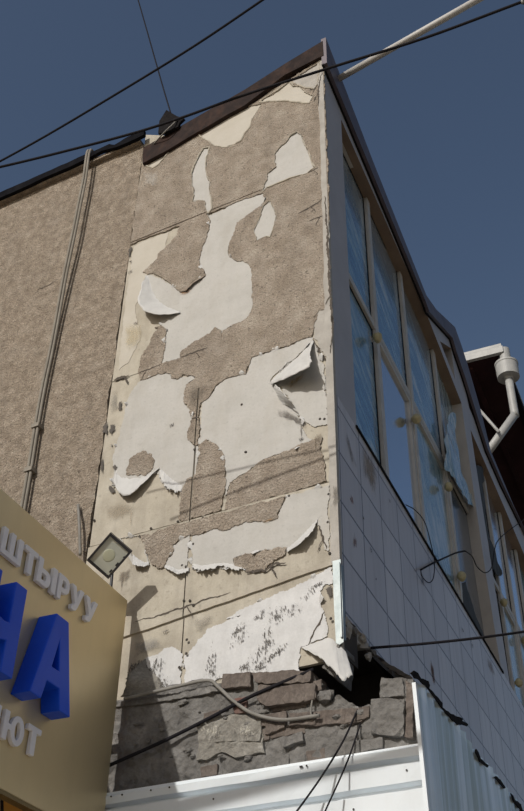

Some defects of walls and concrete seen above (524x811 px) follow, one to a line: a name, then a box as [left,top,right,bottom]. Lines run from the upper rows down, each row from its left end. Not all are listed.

peeling [119,62,320,370]
peeling [100,310,327,496]
peeling [120,532,149,567]
crack [135,592,230,622]
peeling [164,484,331,574]
peeling [121,567,395,707]